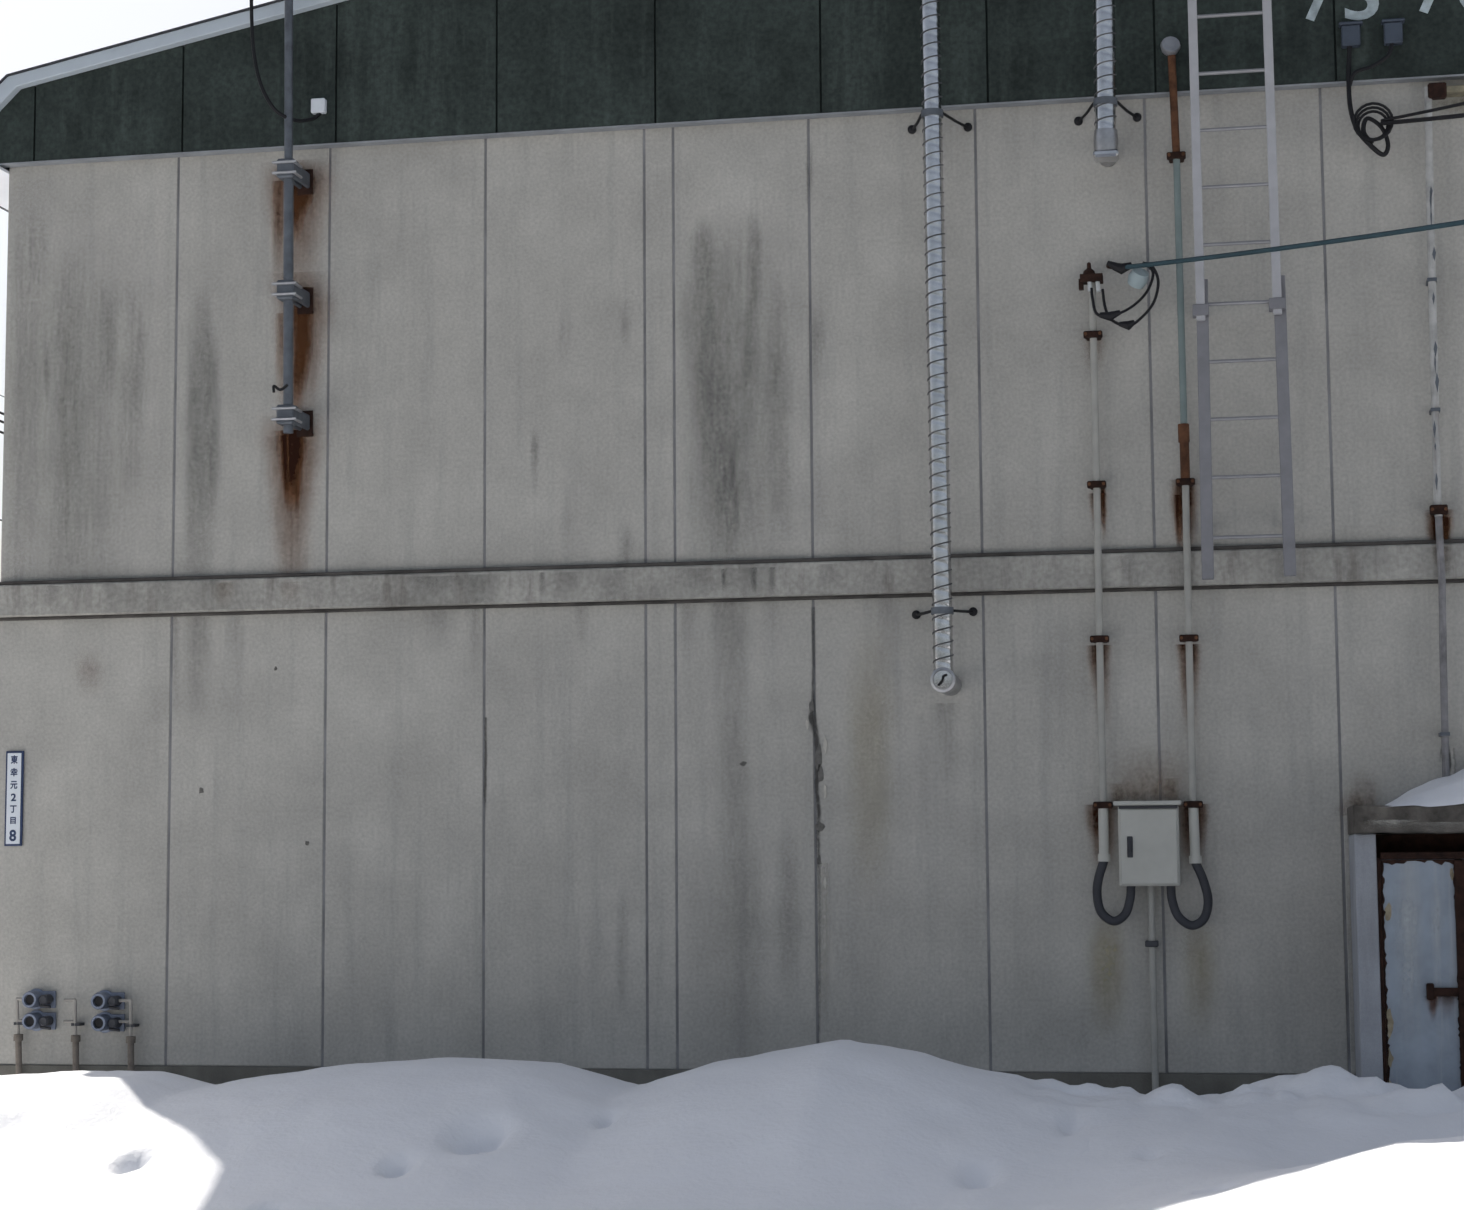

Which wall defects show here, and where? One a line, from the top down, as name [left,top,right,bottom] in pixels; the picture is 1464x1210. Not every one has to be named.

corrosion [276,176,318,238]
corrosion [293,287,319,396]
corrosion [276,429,310,521]
crack [809,607,821,922]
corrosion [1381,859,1455,1083]